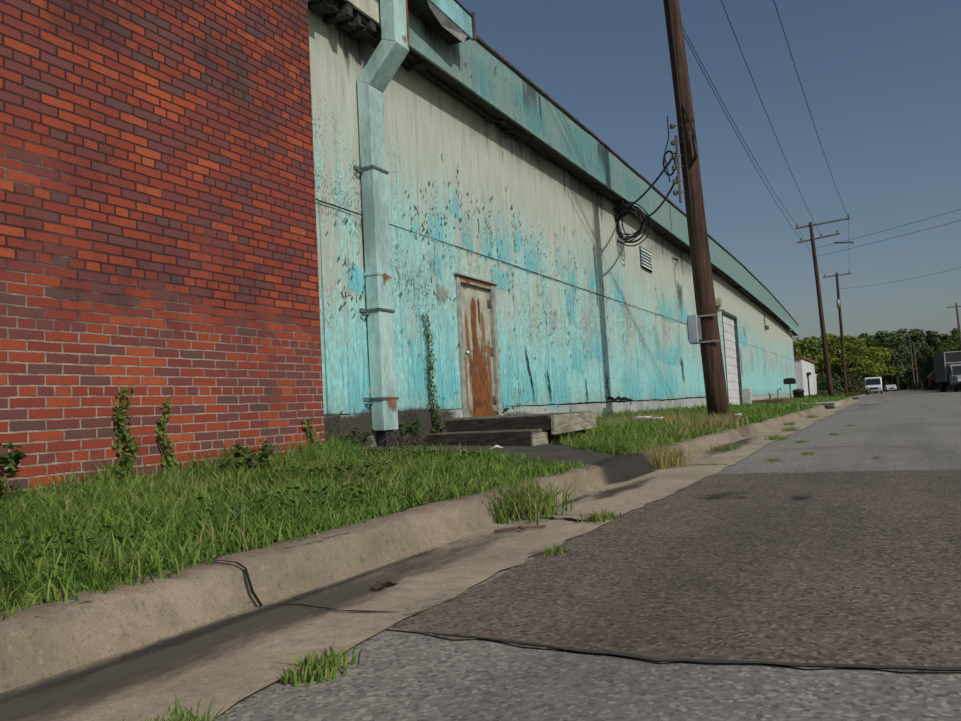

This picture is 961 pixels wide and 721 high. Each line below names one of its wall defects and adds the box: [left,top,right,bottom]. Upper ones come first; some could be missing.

peeling [340,258,366,310]
peeling [340,331,371,416]
peeling [398,164,544,409]
corrosion [459,276,492,287]
corrosion [465,298,495,417]
peeling [499,255,644,413]